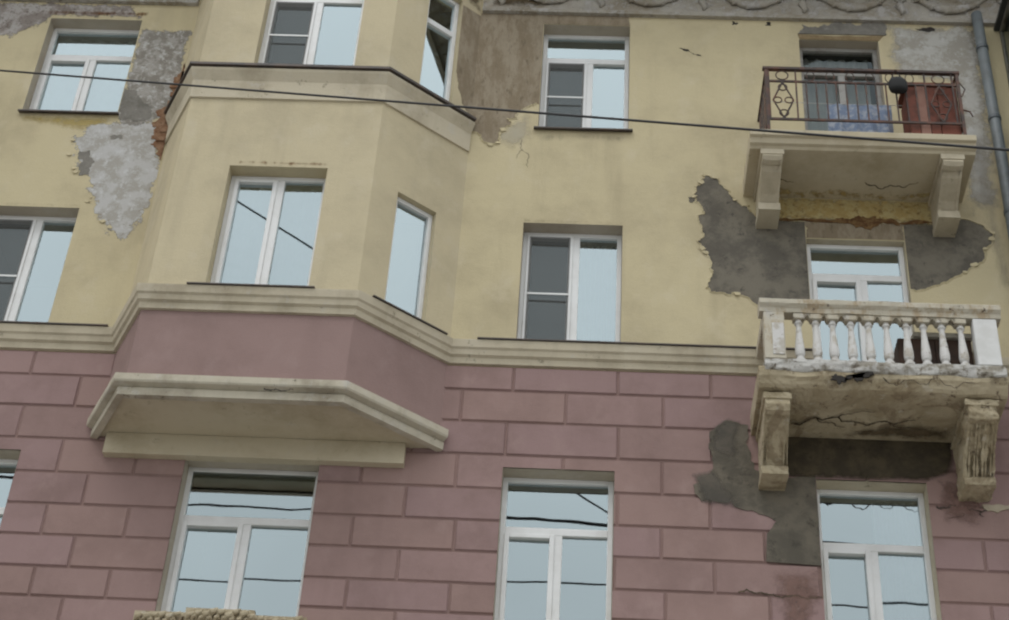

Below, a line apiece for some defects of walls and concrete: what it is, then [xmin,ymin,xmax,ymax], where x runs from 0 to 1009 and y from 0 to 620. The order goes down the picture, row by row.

peeling [0,2,146,38]
peeling [456,0,630,146]
peeling [67,29,193,241]
peeling [688,173,995,307]
spalling [830,372,874,385]
crack [883,377,968,388]
crack [791,411,934,430]
leakage [787,437,953,480]